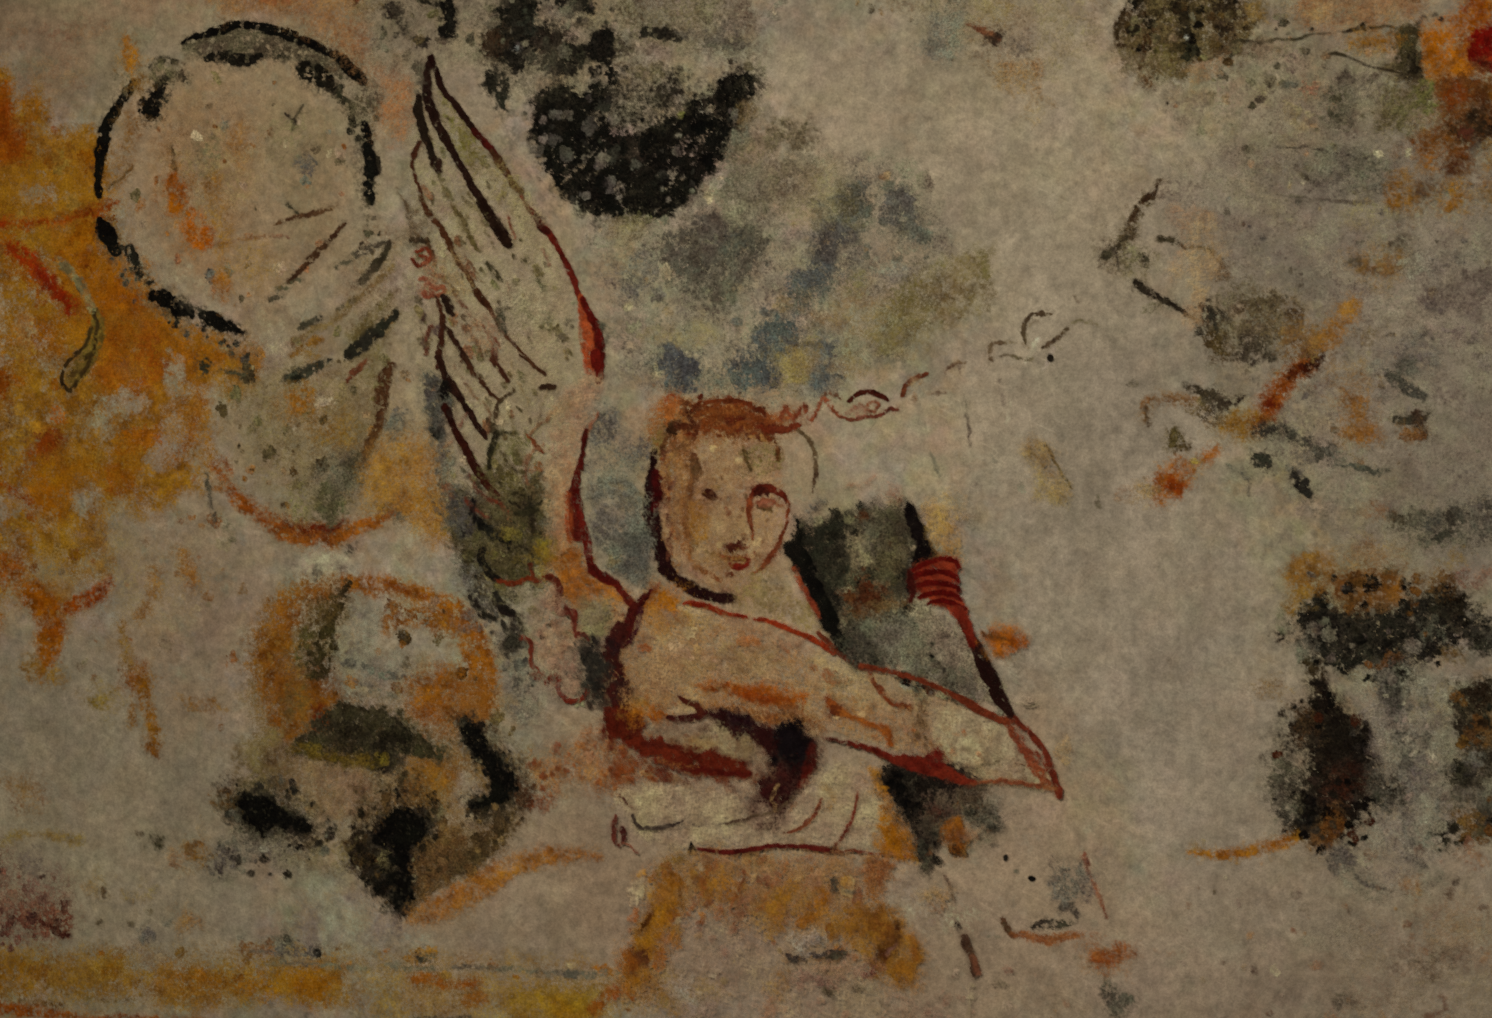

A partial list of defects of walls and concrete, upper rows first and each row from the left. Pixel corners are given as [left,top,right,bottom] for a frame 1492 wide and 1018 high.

damp [479,0,819,222]
damp [1113,0,1267,88]
damp [0,68,261,684]
damp [1227,423,1389,498]
damp [169,700,555,919]
damp [1188,496,1492,981]
damp [0,830,686,1018]